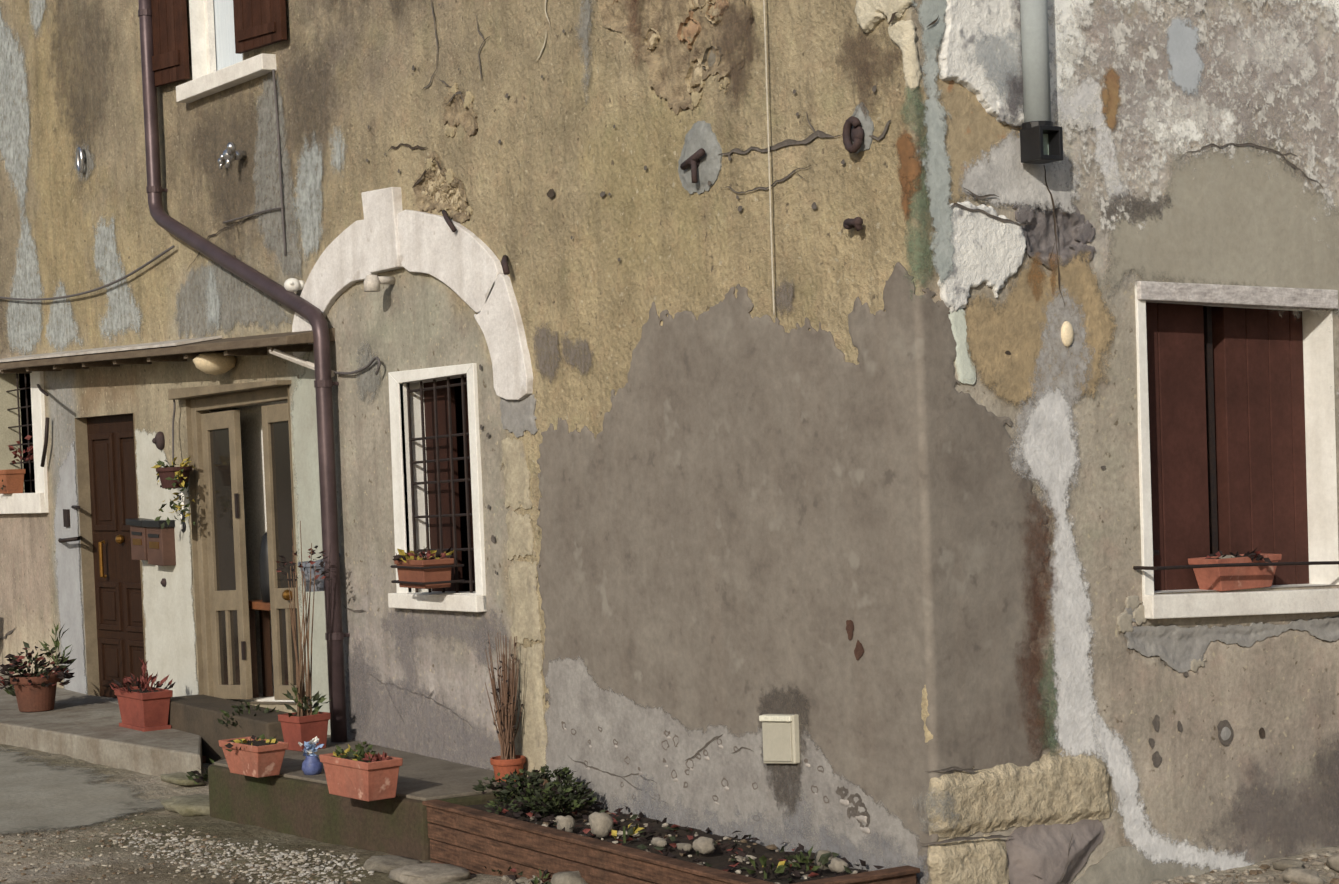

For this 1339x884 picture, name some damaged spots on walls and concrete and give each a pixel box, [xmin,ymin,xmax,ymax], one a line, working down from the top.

spalling [413,151,473,223]
spalling [442,68,478,138]
spalling [598,0,753,115]
crack [718,112,891,194]
peeling [935,0,1339,313]
leakage [1010,288,1253,871]
spalling [1117,595,1339,677]
peeling [544,657,926,884]